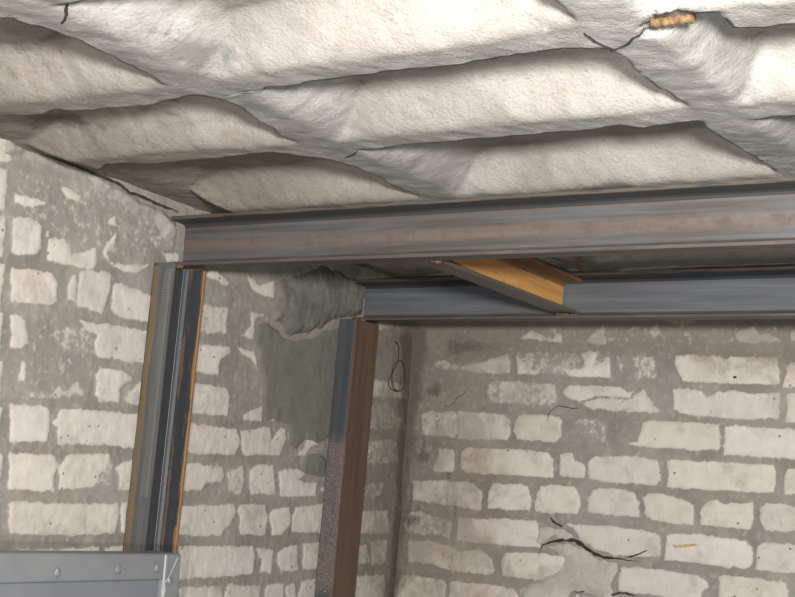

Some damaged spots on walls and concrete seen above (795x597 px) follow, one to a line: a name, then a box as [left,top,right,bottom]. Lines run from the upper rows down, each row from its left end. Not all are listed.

crack [60,4,68,24]
crack [584,21,650,52]
crack [42,154,179,212]
crack [539,517,648,562]